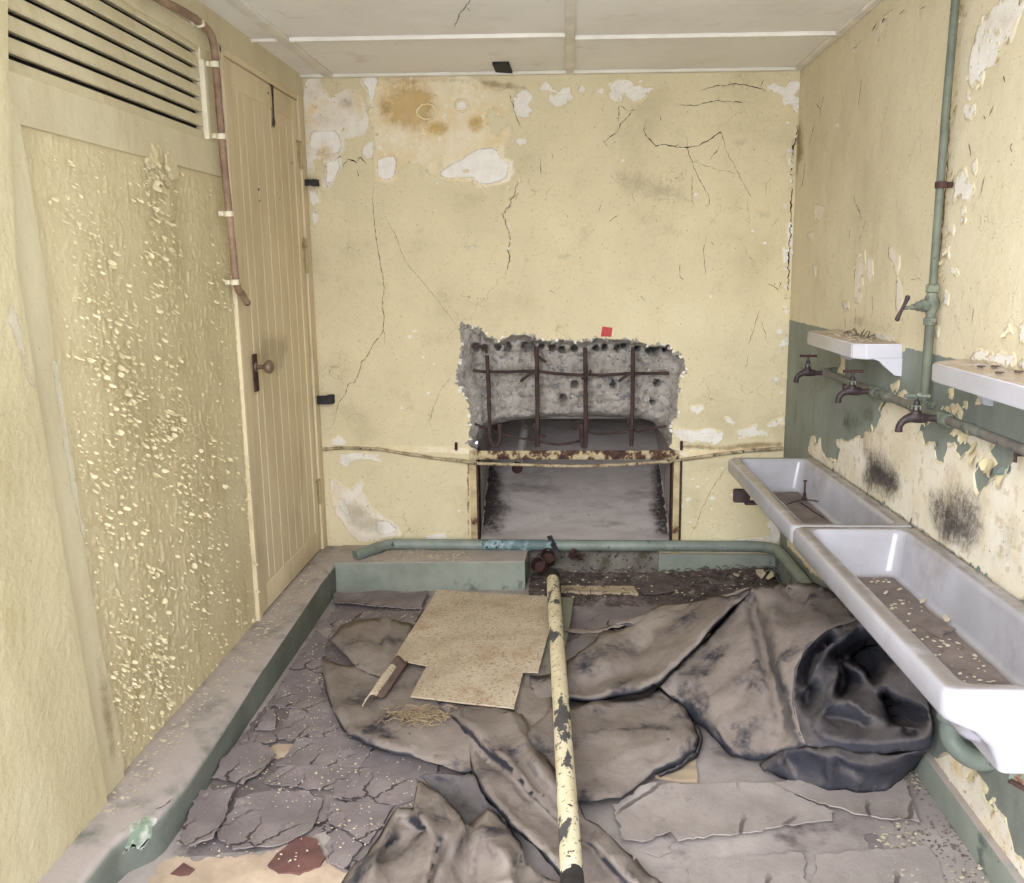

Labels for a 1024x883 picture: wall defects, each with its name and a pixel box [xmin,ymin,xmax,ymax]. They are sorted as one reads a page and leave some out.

crack [685,80,766,106]
peeling [949,0,1024,139]
peeling [303,76,575,260]
crack [601,106,779,226]
crack [328,156,451,430]
spalling [325,322,785,469]
peeling [328,477,402,542]
mould [863,453,899,493]
peeling [808,380,1024,600]
mould [934,494,978,540]